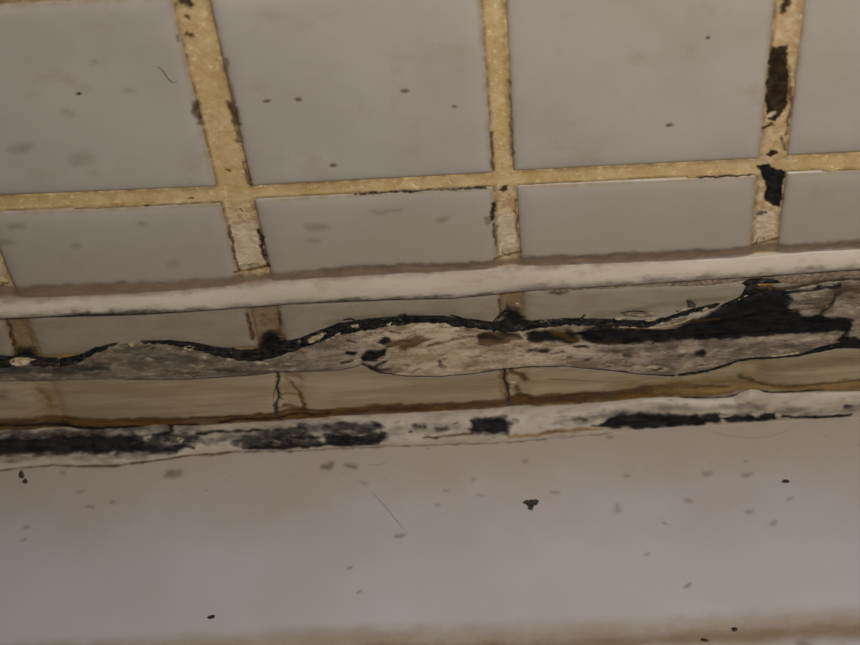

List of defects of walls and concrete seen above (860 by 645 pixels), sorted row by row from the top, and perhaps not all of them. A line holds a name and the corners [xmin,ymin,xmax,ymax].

damp [700,45,792,215]
peeling [8,358,36,366]
crack [273,372,283,419]
damp [0,275,860,457]